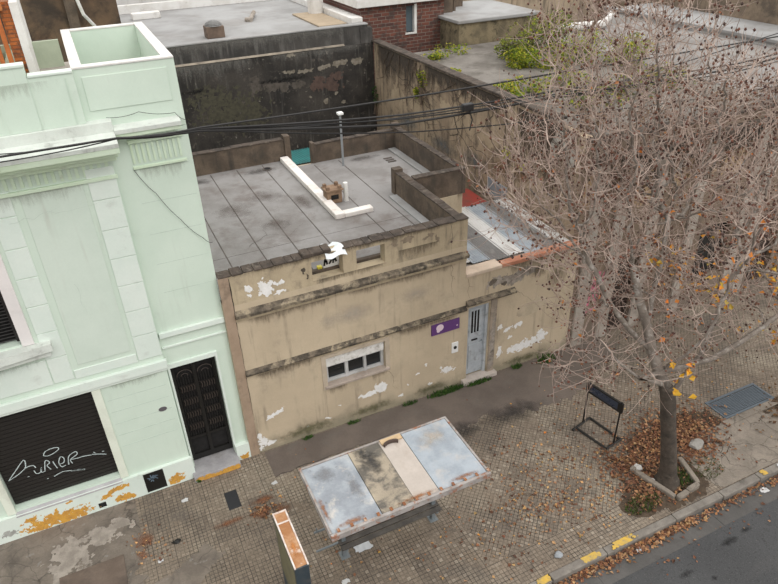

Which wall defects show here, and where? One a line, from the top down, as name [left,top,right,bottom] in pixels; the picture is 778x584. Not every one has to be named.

peeling [244,277,286,297]
peeling [487,308,548,370]
peeling [358,381,388,399]
peeling [257,434,277,451]
peeling [196,451,249,481]
peeling [169,473,185,485]
peeling [2,483,137,539]